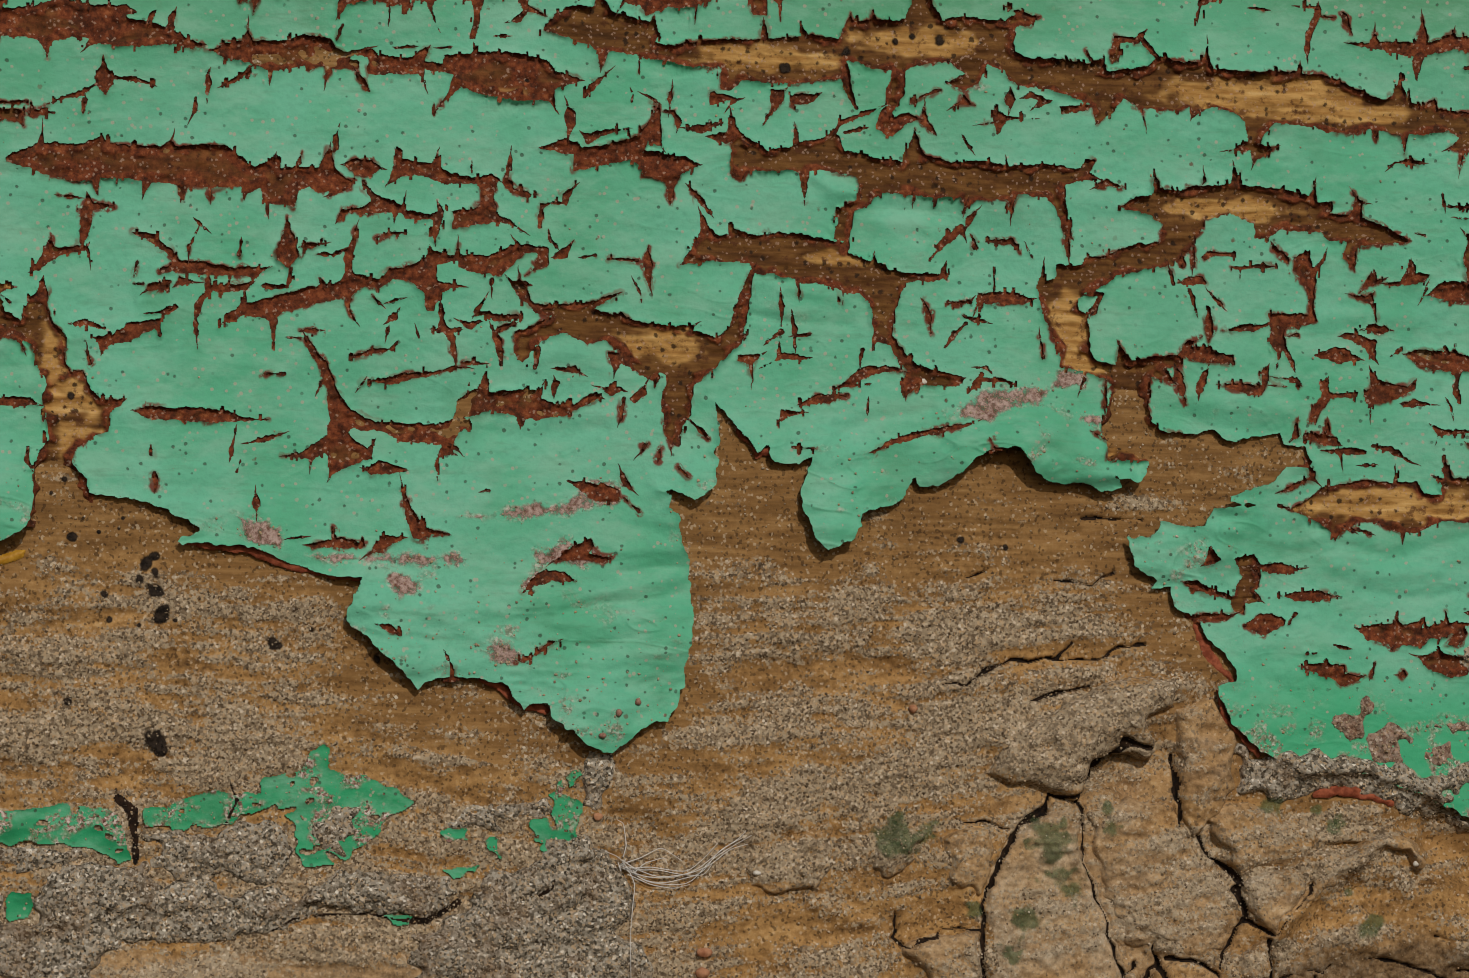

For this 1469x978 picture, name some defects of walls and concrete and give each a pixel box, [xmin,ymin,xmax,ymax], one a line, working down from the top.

peeling [0,404,49,541]
peeling [757,391,1149,550]
peeling [157,490,694,753]
crack [942,641,1146,701]
peeling [1127,510,1469,818]
crack [890,736,1331,978]
crack [1368,935,1469,978]